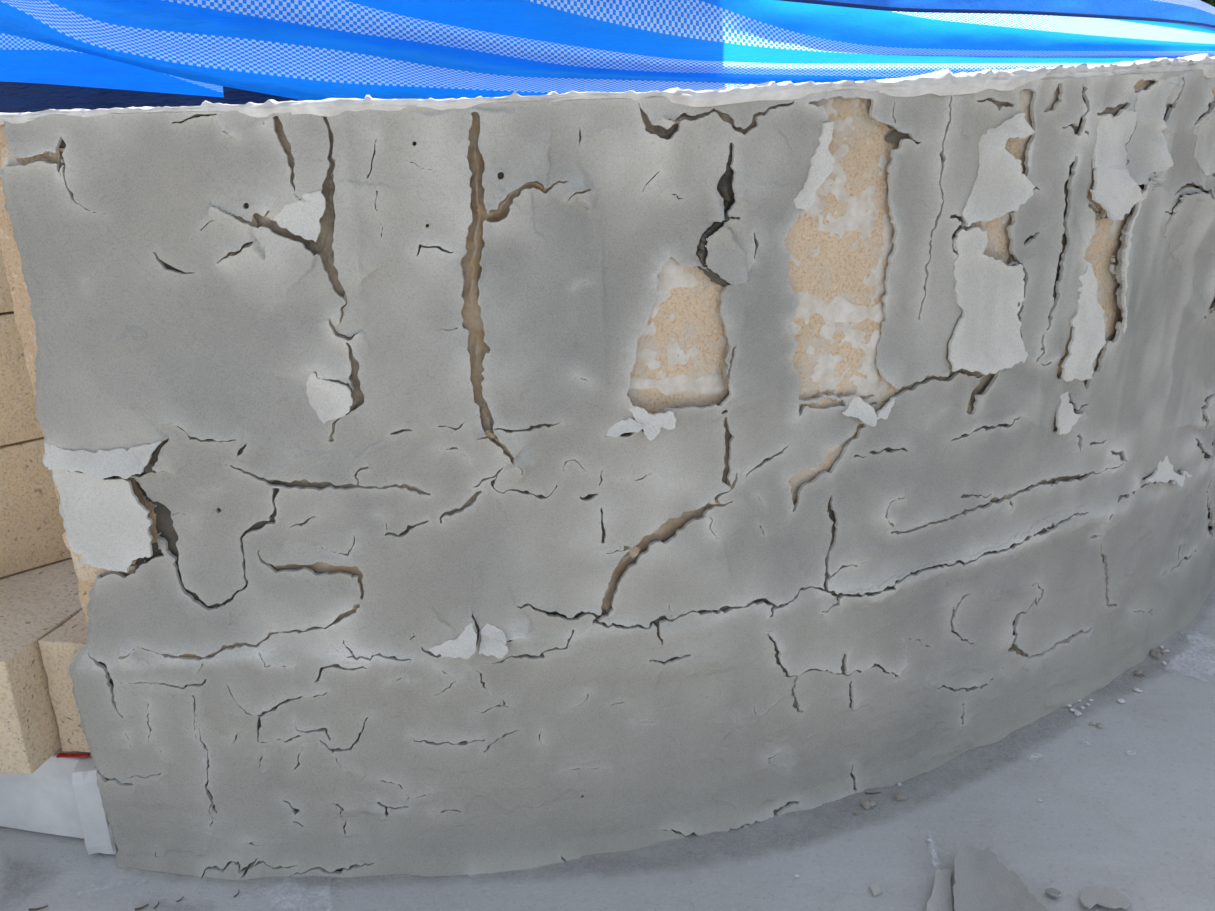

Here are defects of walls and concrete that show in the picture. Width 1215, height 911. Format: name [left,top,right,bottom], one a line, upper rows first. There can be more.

crack [59,139,73,196]
peeling [43,441,163,583]
peeling [272,191,326,242]
crack [112,103,1104,711]
spalling [605,219,755,441]
spalling [784,96,899,505]
crack [977,98,1011,107]
peeling [948,86,1059,375]
crack [890,401,1150,533]
crack [1009,88,1127,319]
peeling [1056,76,1179,435]
crack [204,699,290,824]